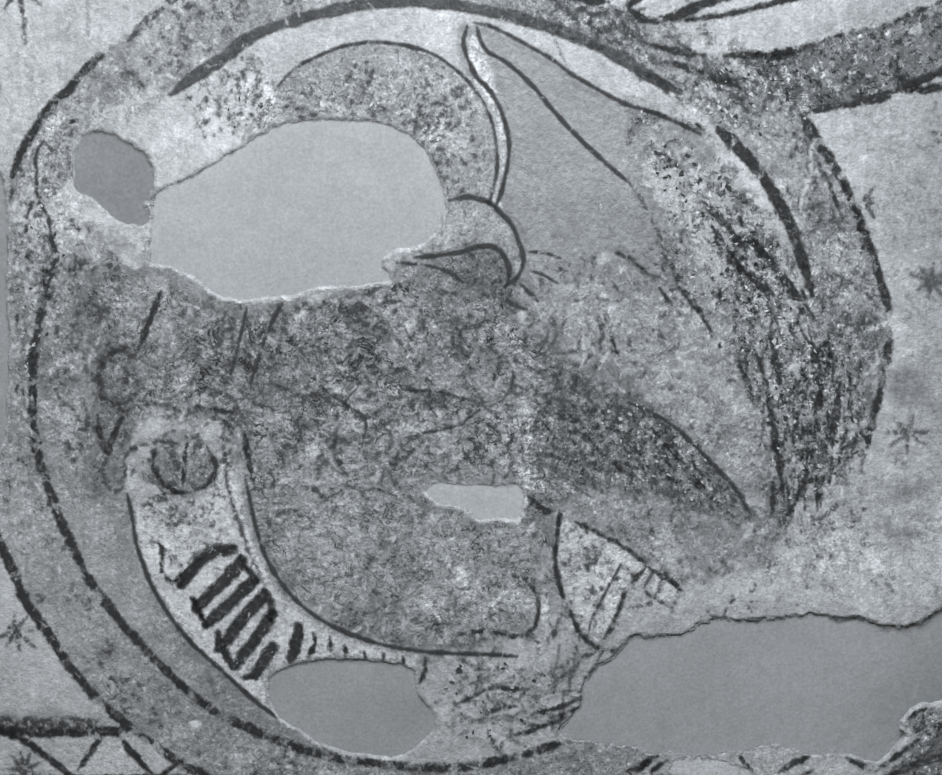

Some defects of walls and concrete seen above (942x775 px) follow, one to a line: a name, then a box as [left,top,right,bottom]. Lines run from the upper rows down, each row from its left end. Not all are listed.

flaking render [73,119,450,309]
peeling [18,324,59,381]
flaking render [420,480,529,525]